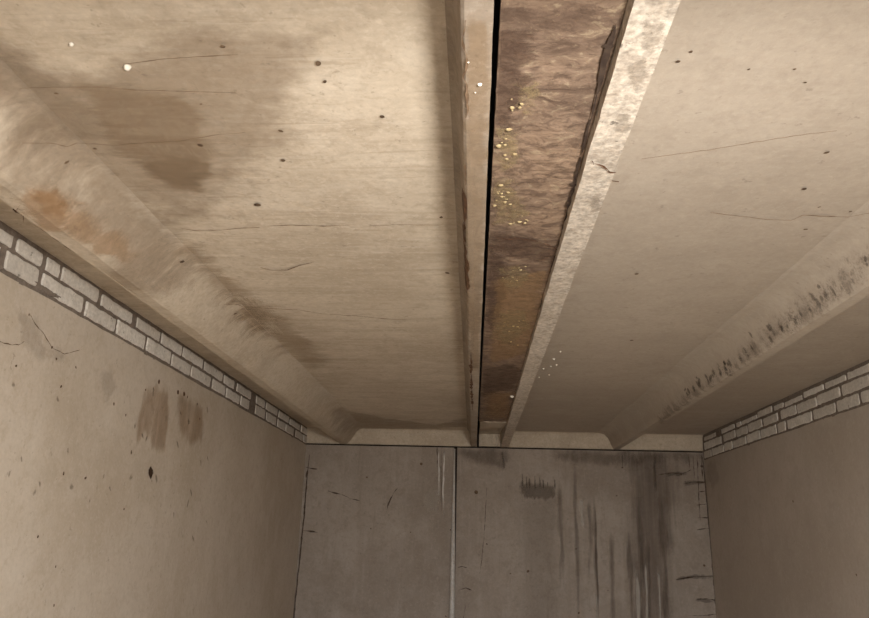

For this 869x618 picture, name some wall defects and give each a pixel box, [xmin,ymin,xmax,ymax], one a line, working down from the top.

crack [497,24,619,272]